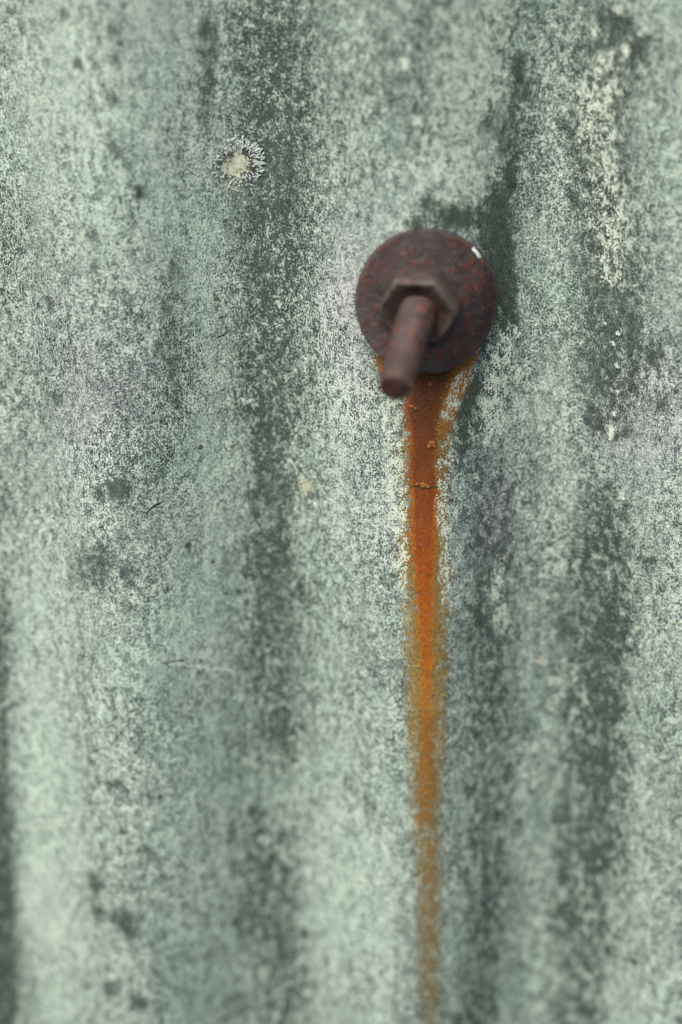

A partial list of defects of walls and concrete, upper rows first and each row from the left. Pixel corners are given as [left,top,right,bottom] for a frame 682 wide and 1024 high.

rust [378,351,487,1024]